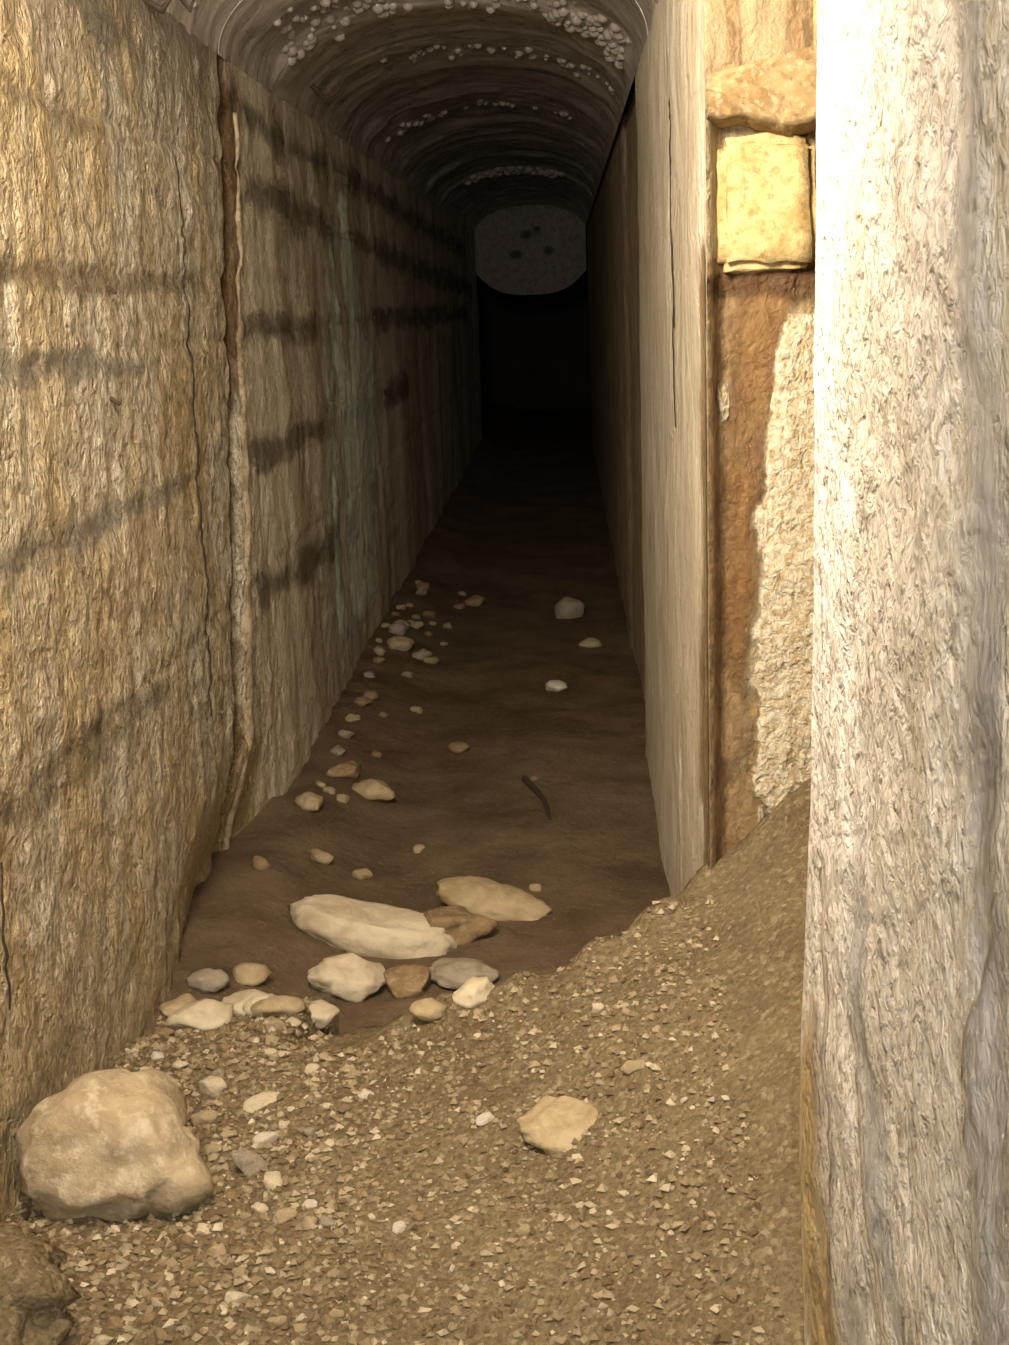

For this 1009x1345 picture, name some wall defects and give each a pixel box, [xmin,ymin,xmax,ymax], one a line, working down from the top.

flaking render [707,45,817,823]